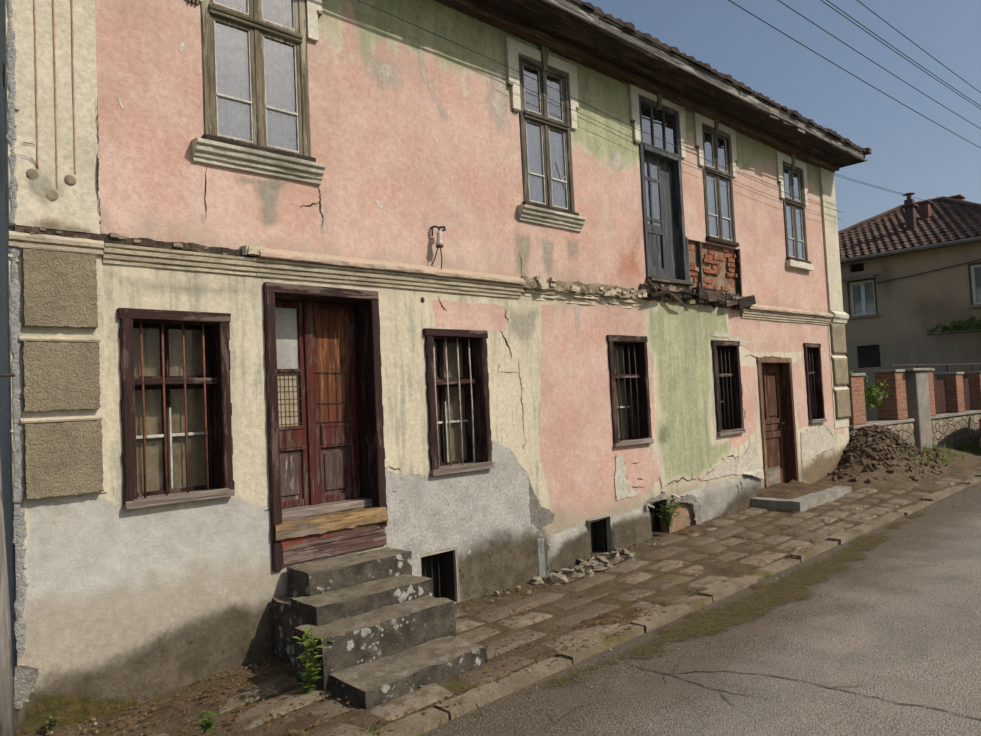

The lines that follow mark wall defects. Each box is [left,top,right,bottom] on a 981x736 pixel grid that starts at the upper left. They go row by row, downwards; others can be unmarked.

crack [300,186,324,224]
flaking render [685,236,742,297]
crack [498,310,527,449]
peeling [614,454,642,500]
crack [629,455,742,500]
peeling [385,440,555,602]
water stain [14,606,273,733]